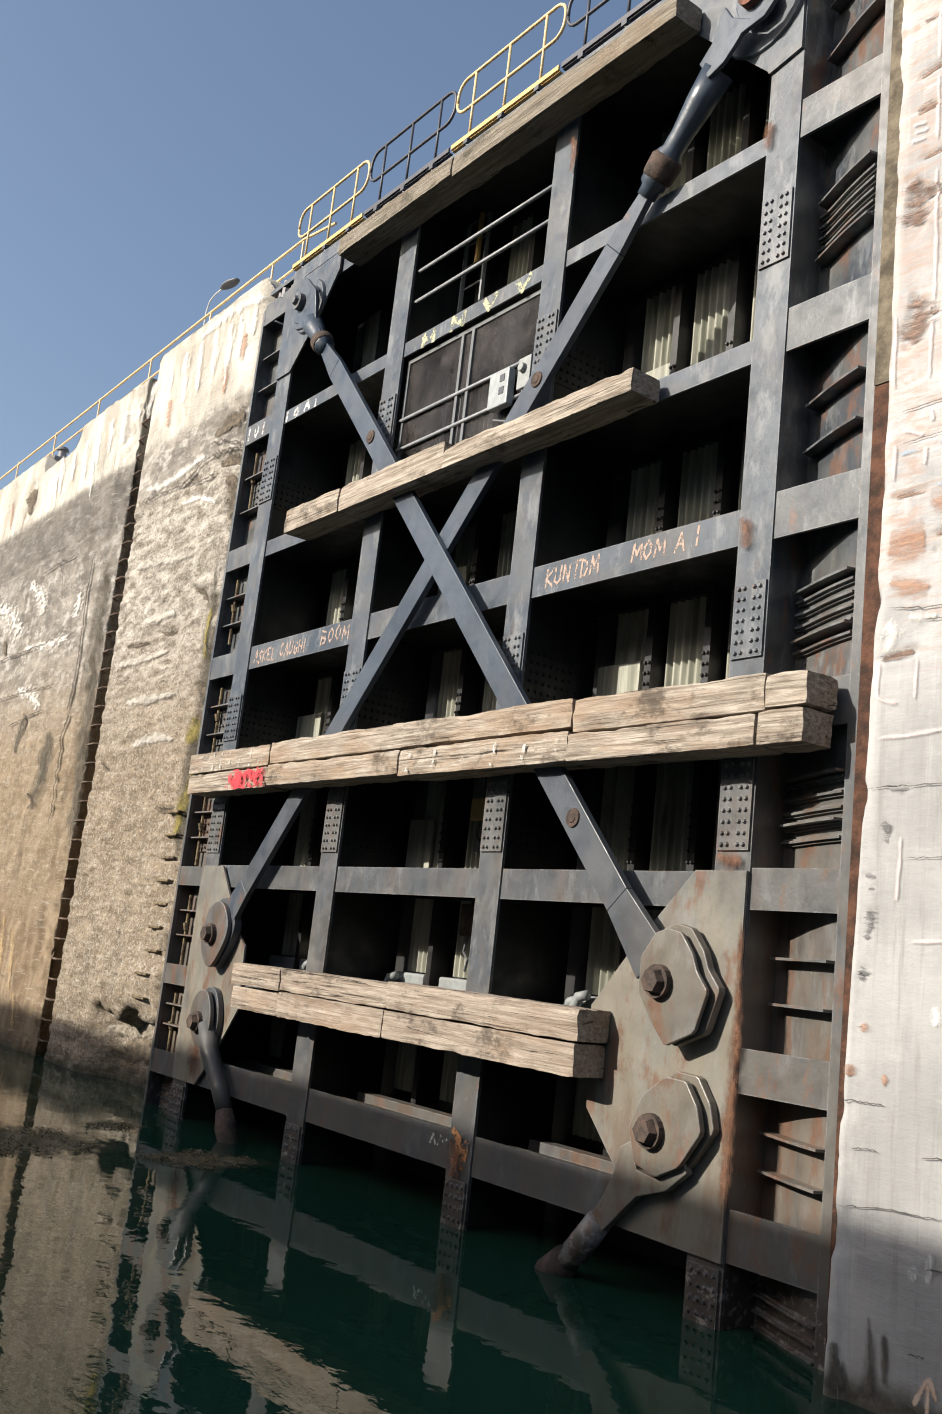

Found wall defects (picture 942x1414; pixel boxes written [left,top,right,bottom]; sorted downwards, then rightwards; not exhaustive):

rust [451,1127,469,1170]